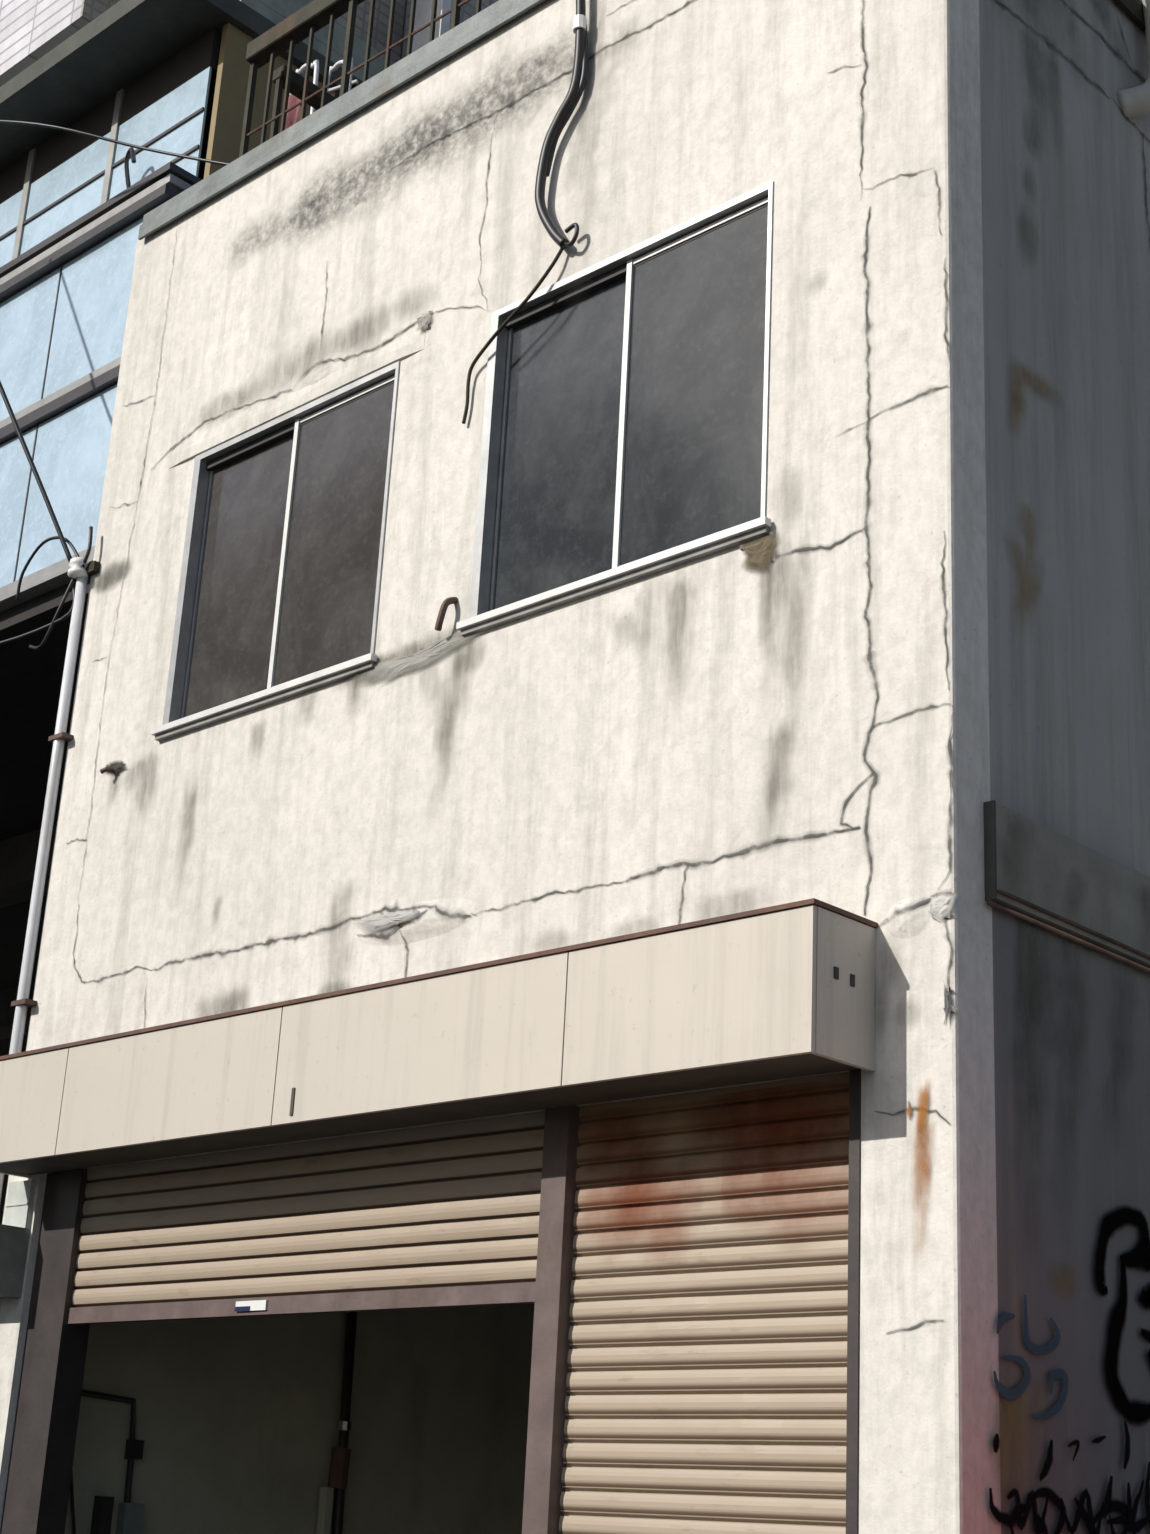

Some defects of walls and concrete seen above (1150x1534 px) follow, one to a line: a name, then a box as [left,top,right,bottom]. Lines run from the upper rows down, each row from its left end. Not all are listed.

crack [996,0,1150,224]
crack [69,0,953,1023]
rust [907,1087,929,1179]
crack [886,1320,943,1334]